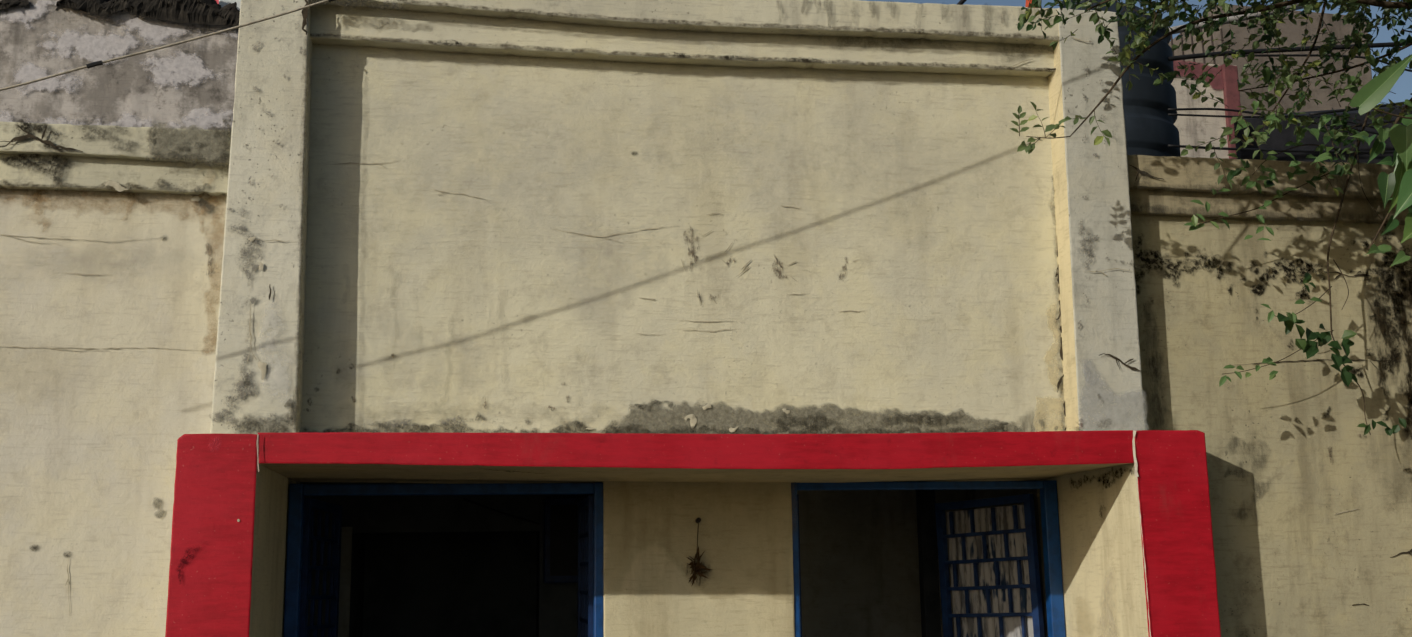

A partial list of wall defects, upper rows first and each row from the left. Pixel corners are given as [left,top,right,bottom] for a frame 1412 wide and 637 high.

crack [0,125,83,152]
water stain [1135,236,1325,318]
water stain [1347,224,1412,439]
flaking render [214,348,1022,435]